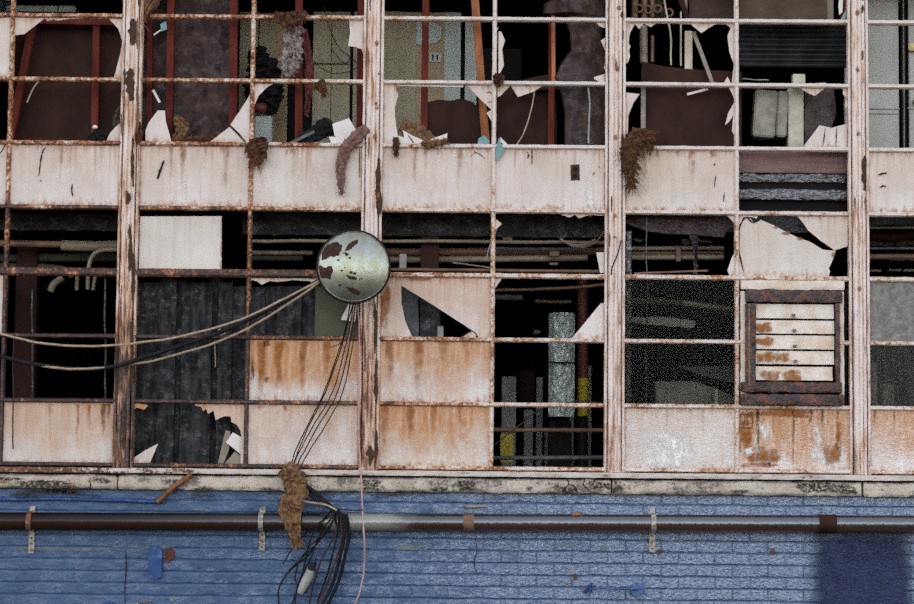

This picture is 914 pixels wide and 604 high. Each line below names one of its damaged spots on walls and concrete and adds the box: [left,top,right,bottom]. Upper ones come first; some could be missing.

corrosion [252,341,284,382]
corrosion [739,409,824,467]
corrosion [824,412,842,463]